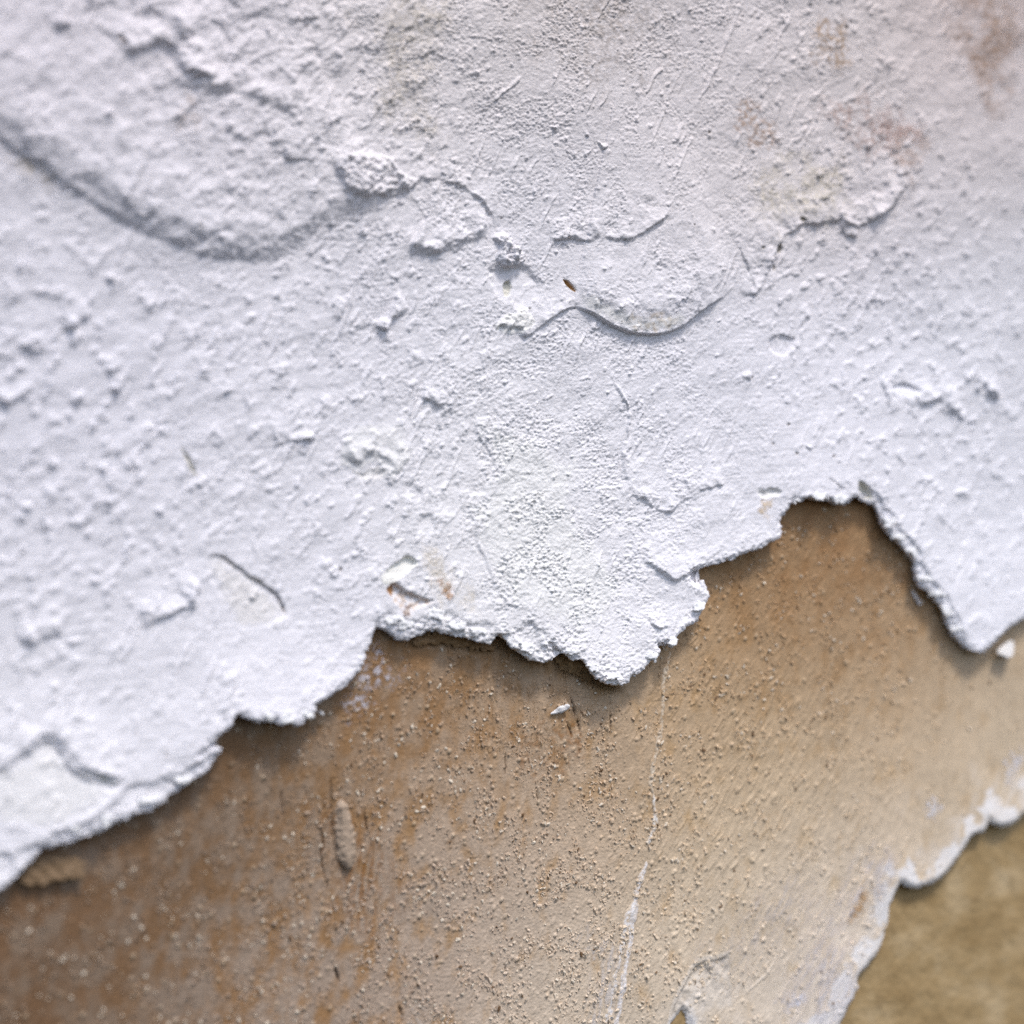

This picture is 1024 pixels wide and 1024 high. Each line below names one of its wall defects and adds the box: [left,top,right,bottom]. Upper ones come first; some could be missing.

peeling [882,517,917,557]
spalling [207,554,287,633]
spalling [380,555,488,637]
peeling [911,575,965,633]
peeling [507,635,536,654]
flaking render [997,640,1014,659]
peeling [585,663,624,681]
peeling [264,709,315,726]
peeling [551,704,570,715]
spalling [0,692,128,837]
peeling [174,772,192,786]
peeling [18,853,86,888]